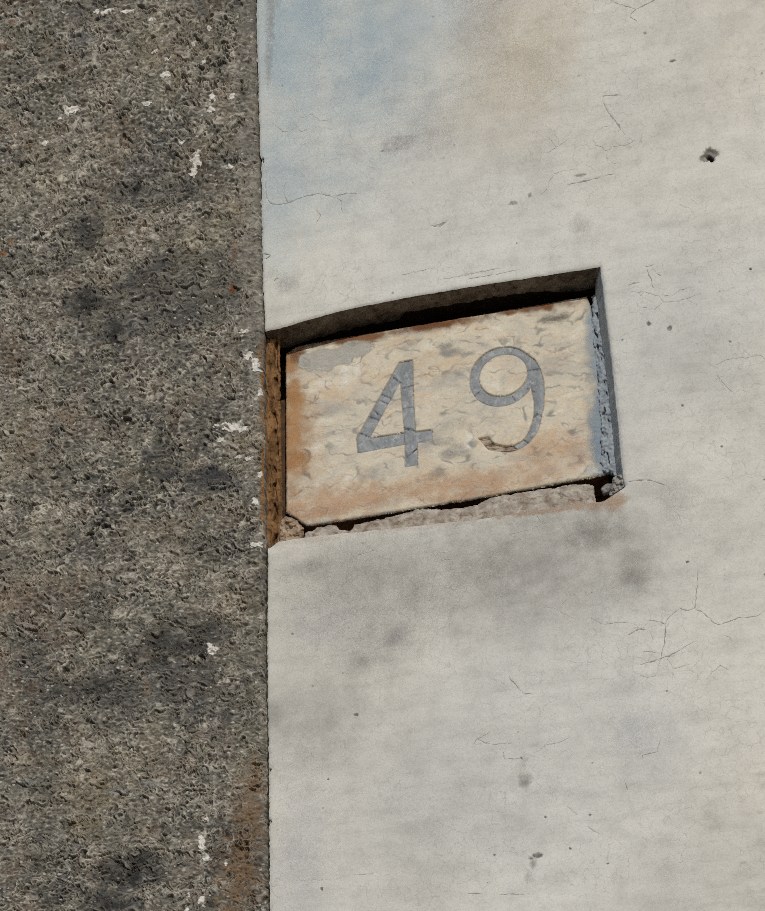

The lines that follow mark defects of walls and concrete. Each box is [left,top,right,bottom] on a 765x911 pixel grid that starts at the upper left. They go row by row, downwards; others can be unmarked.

crack [549,572,764,685]